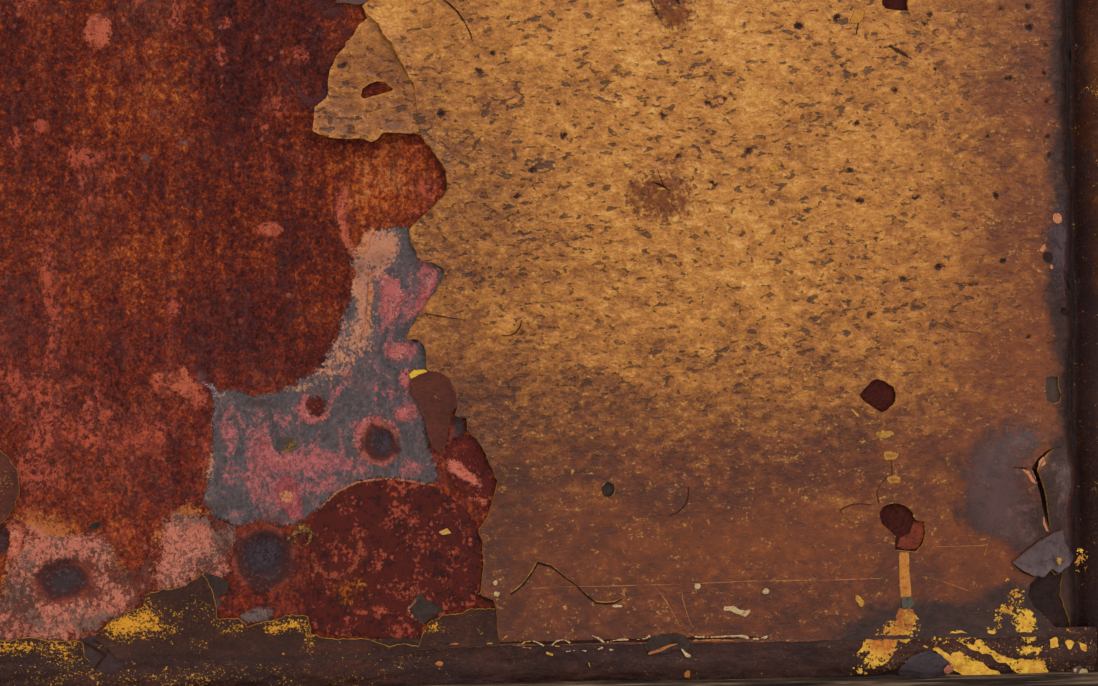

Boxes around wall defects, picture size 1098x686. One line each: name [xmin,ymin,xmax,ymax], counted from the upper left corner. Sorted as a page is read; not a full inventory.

crack [444,0,473,42]
corrosion [0,0,497,641]
peeling [312,0,1088,675]
peeling [0,226,444,670]
crack [1014,447,1062,531]
peeling [80,574,540,675]
crack [478,560,622,605]
crack [487,635,650,666]
crack [688,634,768,642]